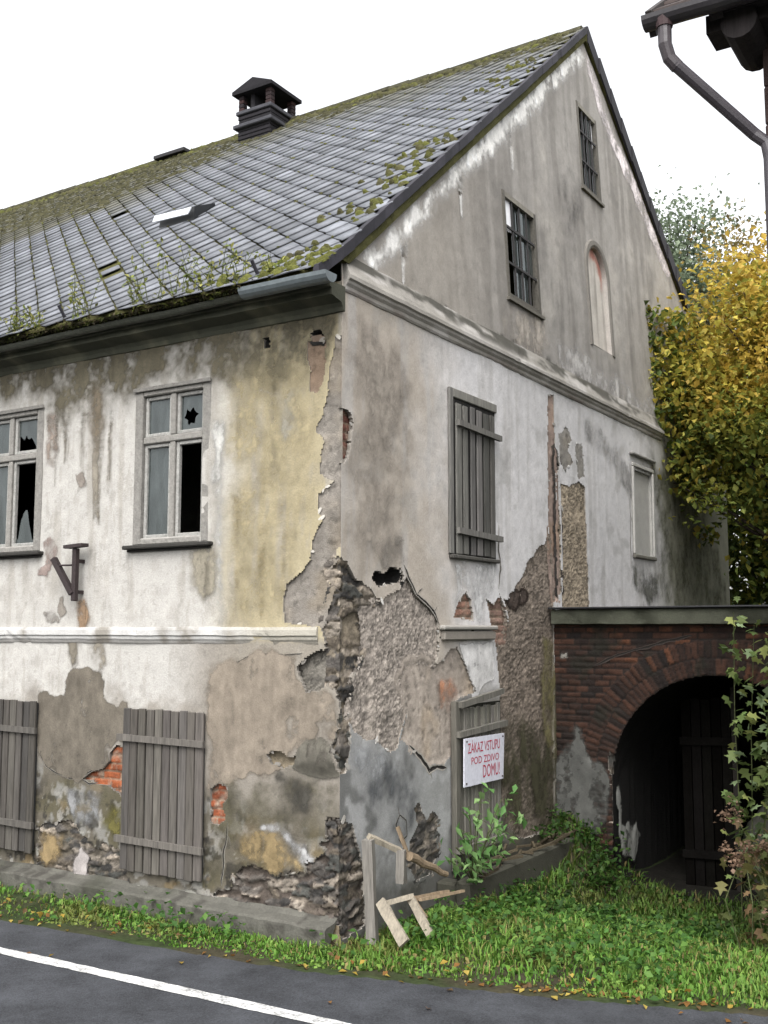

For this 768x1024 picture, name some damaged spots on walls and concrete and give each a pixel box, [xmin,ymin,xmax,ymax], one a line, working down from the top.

water stain [364,48,671,284]
peeling [37,667,127,794]
water stain [0,315,336,519]
water stain [234,489,288,612]
spalling [285,330,353,628]
peeling [206,567,475,824]
spalling [406,803,441,886]
spalling [486,423,590,838]